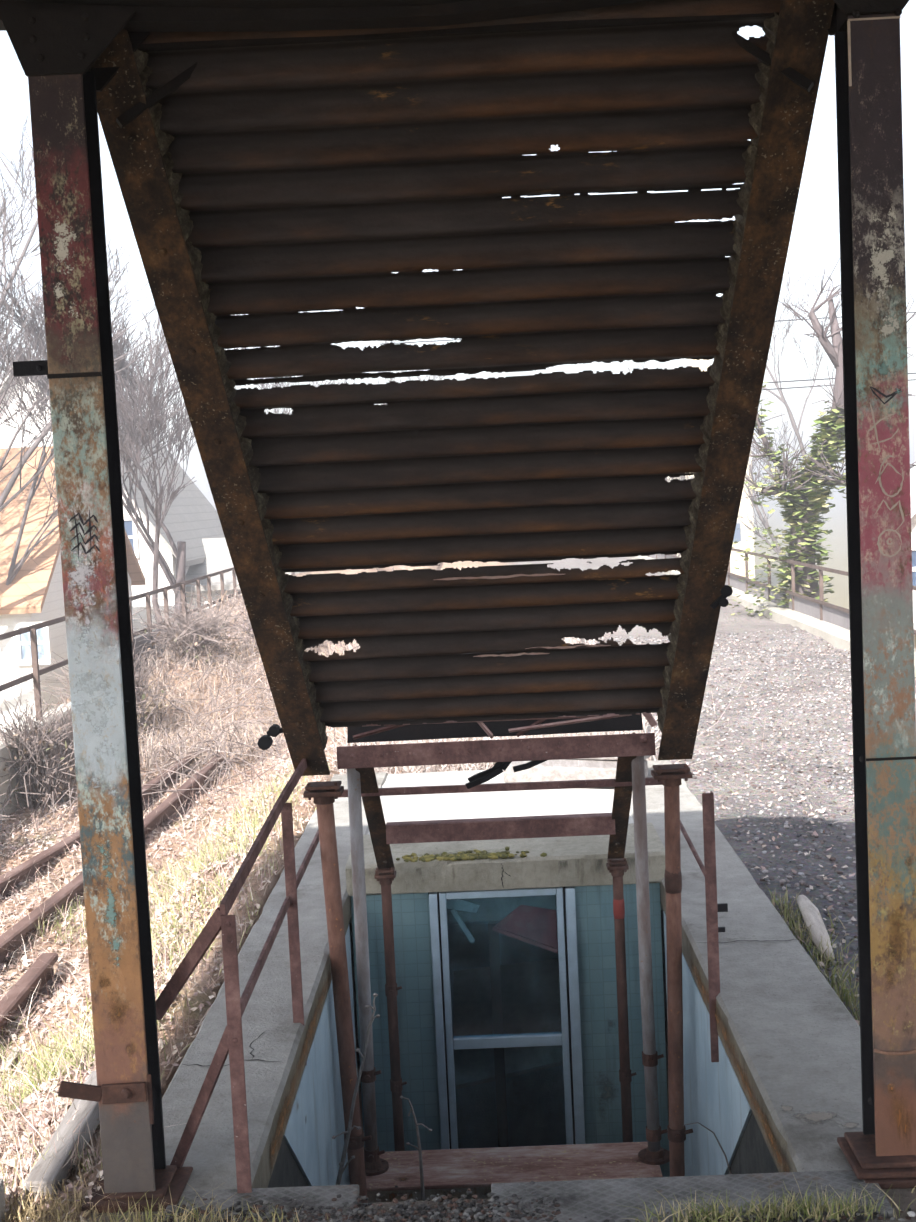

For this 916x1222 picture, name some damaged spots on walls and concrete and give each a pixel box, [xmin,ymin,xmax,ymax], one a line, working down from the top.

peeling [52,217,79,318]
peeling [869,207,898,301]
peeling [879,314,900,338]
rust [271,972,331,1164]